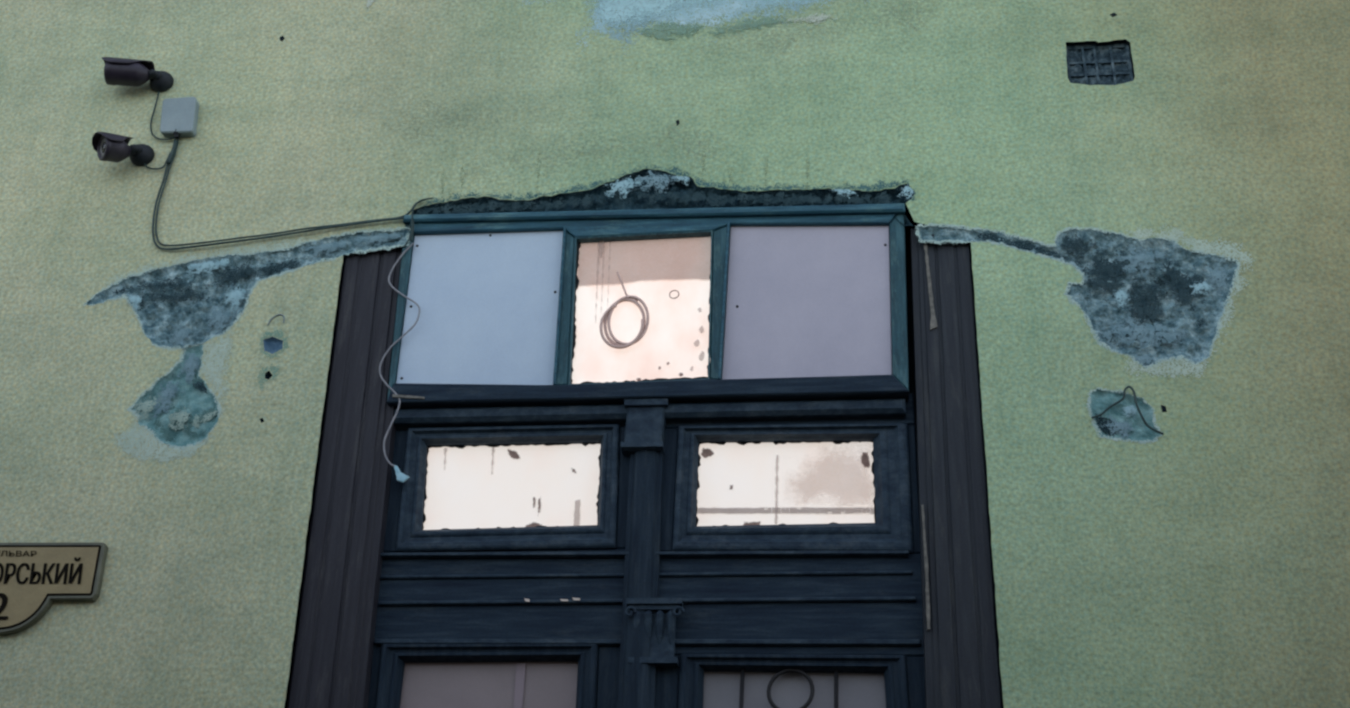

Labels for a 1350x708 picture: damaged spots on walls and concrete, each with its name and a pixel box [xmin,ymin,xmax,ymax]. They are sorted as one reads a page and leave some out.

spalling [83,164,1257,466]